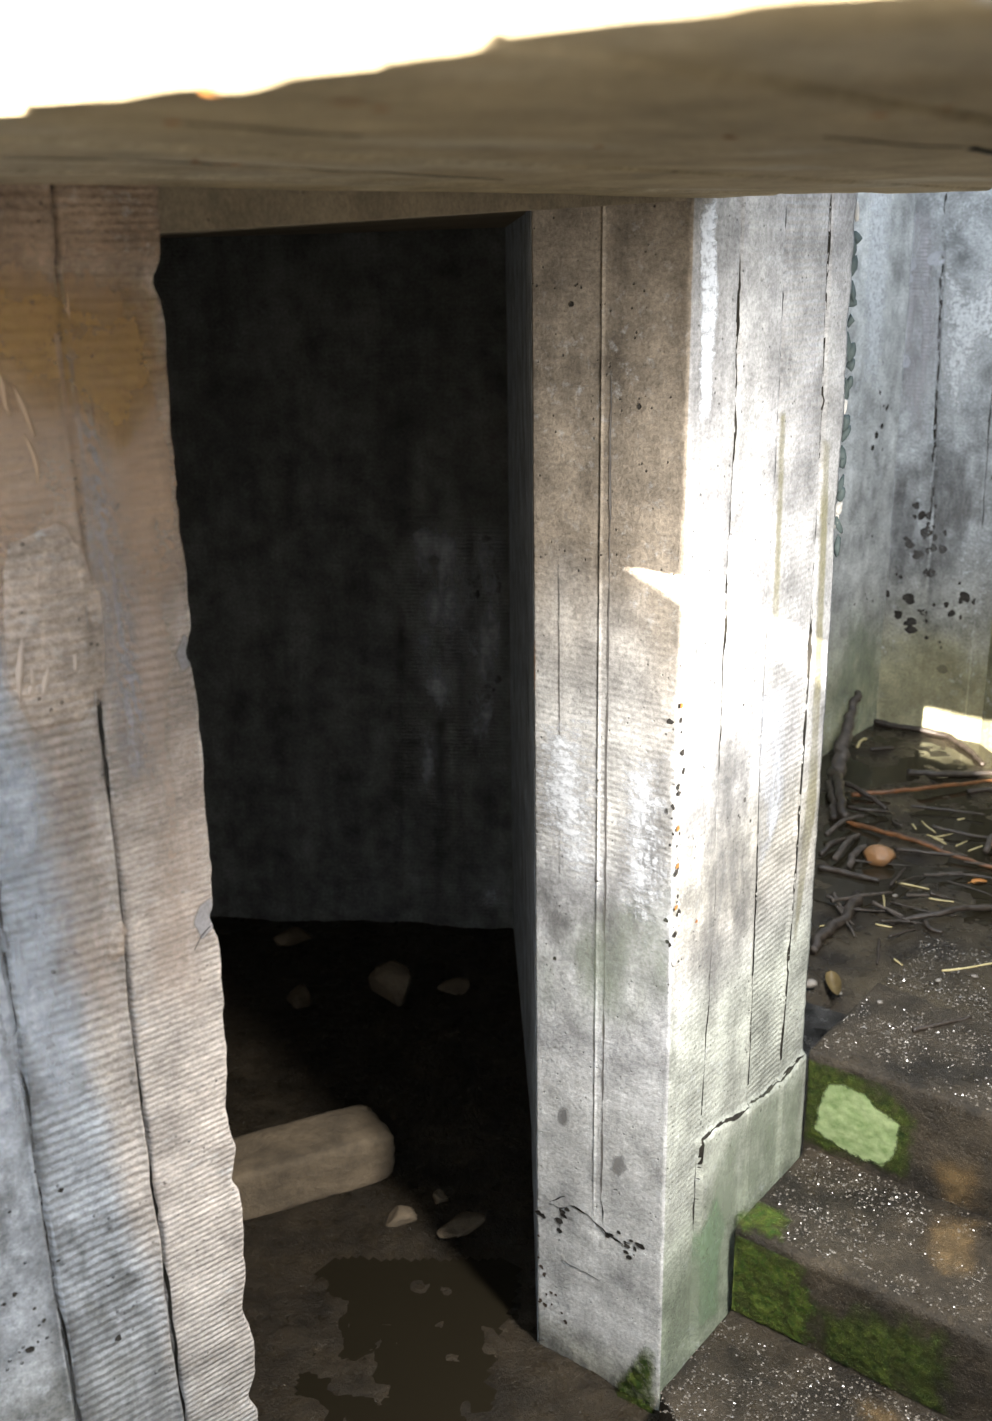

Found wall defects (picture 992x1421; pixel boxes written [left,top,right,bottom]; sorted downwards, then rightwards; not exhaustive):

crack [826,137,992,155]
crack [819,196,832,458]
crack [718,259,741,772]
crack [693,610,813,1224]
peeling [815,1085,899,1165]
damp [933,1225,971,1272]